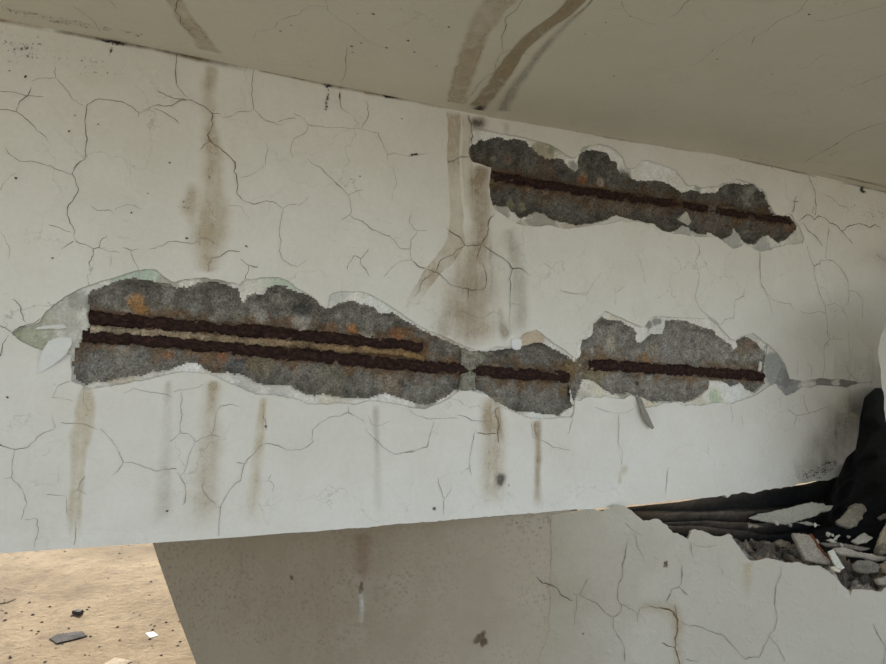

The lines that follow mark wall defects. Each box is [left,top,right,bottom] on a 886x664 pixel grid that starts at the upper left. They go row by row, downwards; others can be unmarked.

water stain [449,0,591,110]
crack [0,0,599,326]
spalling [469,128,803,251]
corrosion [490,171,792,225]
crack [695,122,886,376]
crack [0,299,41,356]
corrosion [82,310,570,383]
spalling [12,269,871,429]
corrosion [588,359,766,381]
crack [0,381,500,546]
crack [539,526,785,664]
spalling [727,533,886,592]